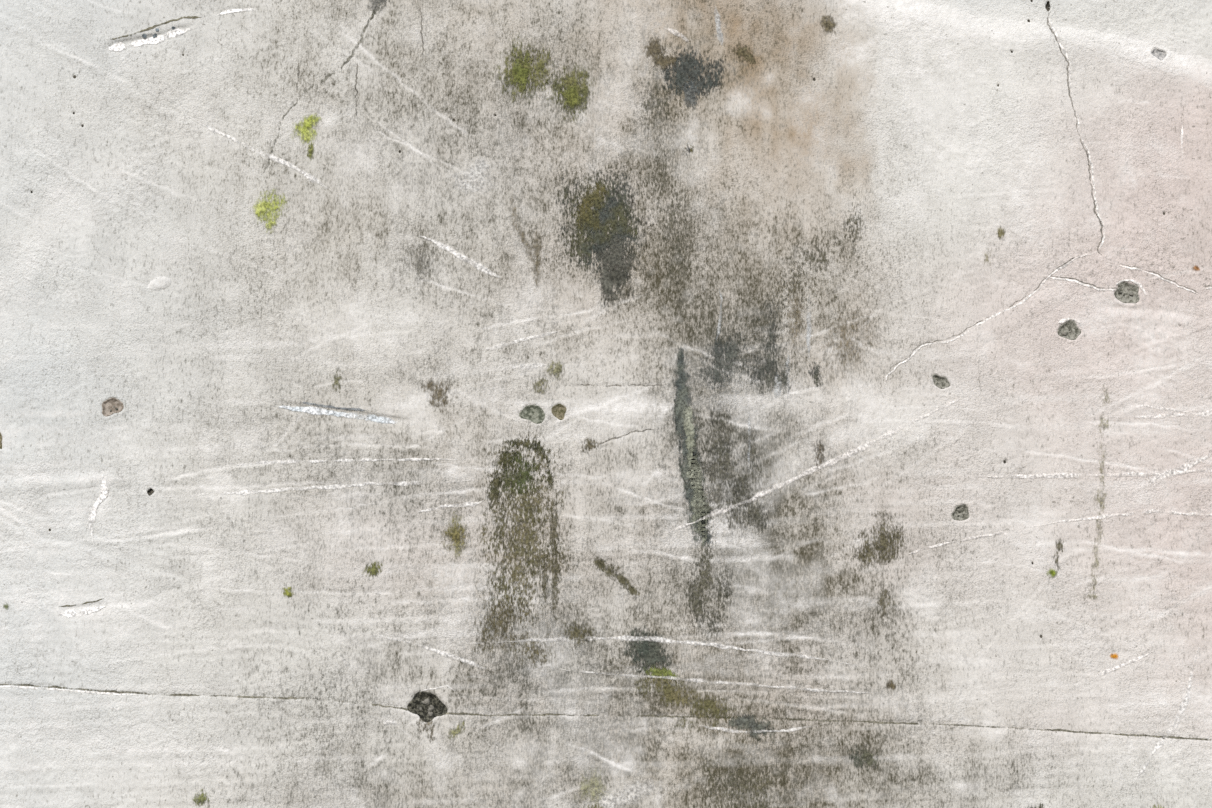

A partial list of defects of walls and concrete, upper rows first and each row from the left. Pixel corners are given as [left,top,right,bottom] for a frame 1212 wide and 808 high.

crack [880,15,1212,388]
water stain [513,207,542,284]
water stain [542,502,560,609]
crack [0,684,304,699]
crack [372,703,408,711]
spalling [407,686,449,740]
crack [445,710,599,718]
crack [637,712,733,720]
crack [772,718,1211,741]